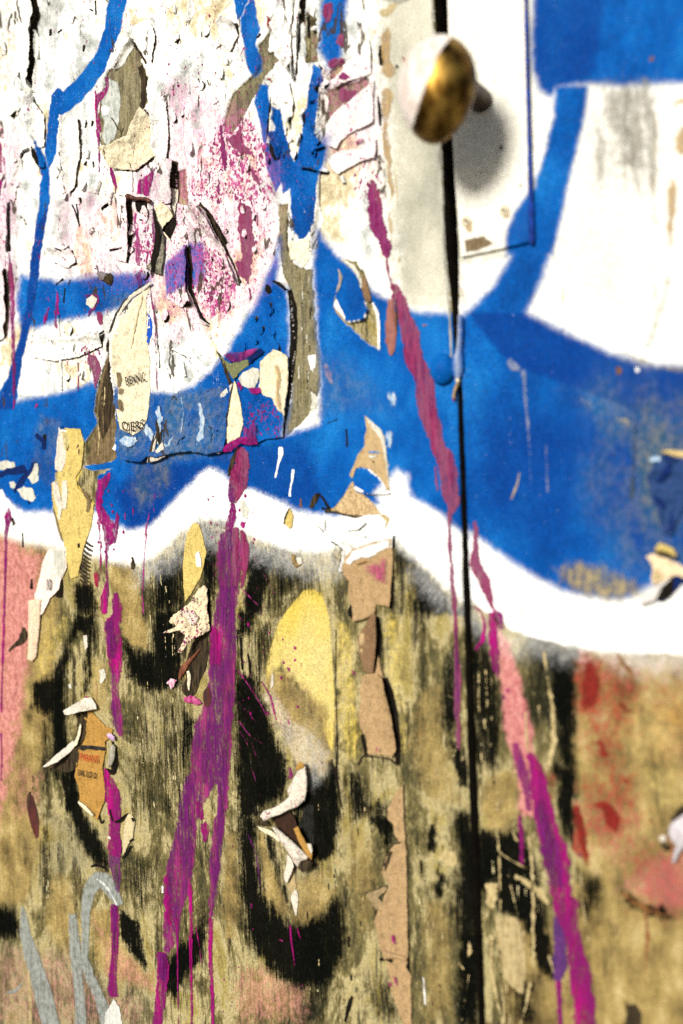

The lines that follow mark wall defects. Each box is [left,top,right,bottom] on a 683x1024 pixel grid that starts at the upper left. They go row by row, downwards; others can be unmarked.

peeling [73,79,121,145]
peeling [138,65,148,108]
peeling [125,206,149,257]
peeling [240,203,267,237]
peeling [332,259,380,349]
peeling [283,415,390,529]
peeling [99,809,135,859]